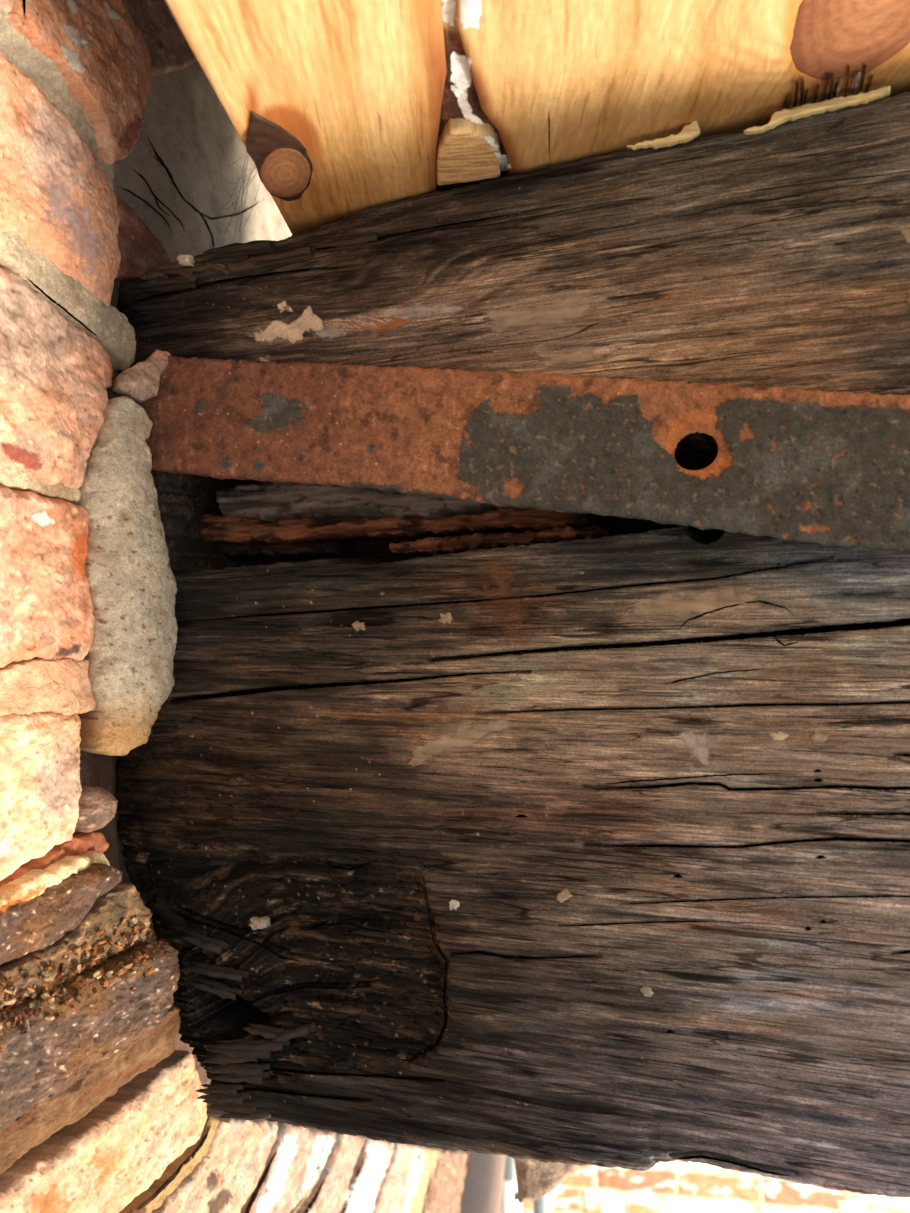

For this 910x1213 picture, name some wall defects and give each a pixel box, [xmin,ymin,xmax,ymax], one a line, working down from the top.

crack [118,135,264,248]
crack [377,214,512,240]
crack [132,247,337,302]
crack [175,557,910,714]
crack [584,773,910,848]
crack [324,862,366,870]
crack [565,895,910,926]
crack [170,909,374,995]
crack [238,885,592,1101]